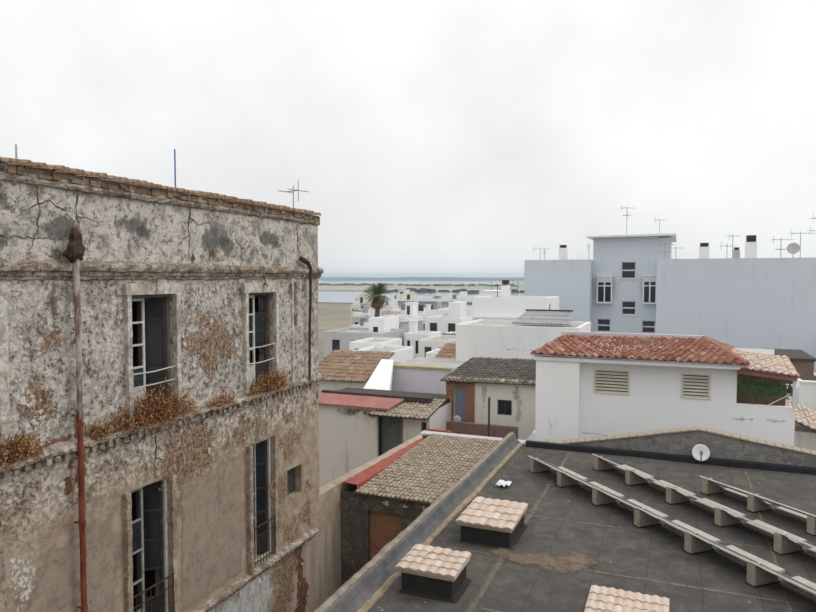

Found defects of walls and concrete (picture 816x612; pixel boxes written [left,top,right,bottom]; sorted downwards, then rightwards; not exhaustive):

crack [0,186,101,246]
crack [177,207,207,259]
spalling [173,282,243,378]
peeling [279,285,308,368]
spalling [142,419,216,524]
peeling [209,407,313,612]